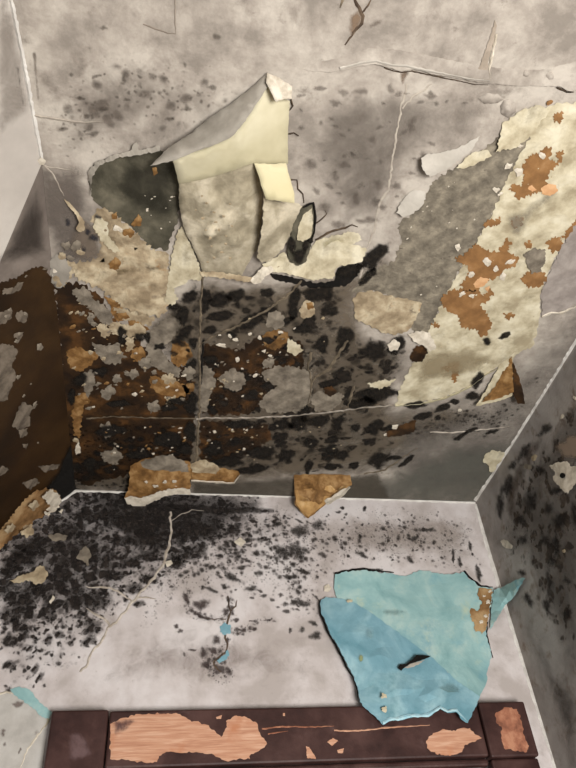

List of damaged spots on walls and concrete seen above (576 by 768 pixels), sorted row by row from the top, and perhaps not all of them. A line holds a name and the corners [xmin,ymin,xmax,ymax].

leakage [62,96,122,140]
leakage [123,72,209,119]
peeling [421,136,492,177]
peeling [0,308,28,401]
peeling [12,394,39,448]
leakage [0,244,530,688]
peeling [0,478,63,549]
leakage [497,412,576,640]
crack [79,509,202,672]
crack [188,590,272,676]
peeling [319,568,529,756]
peeling [109,712,267,763]